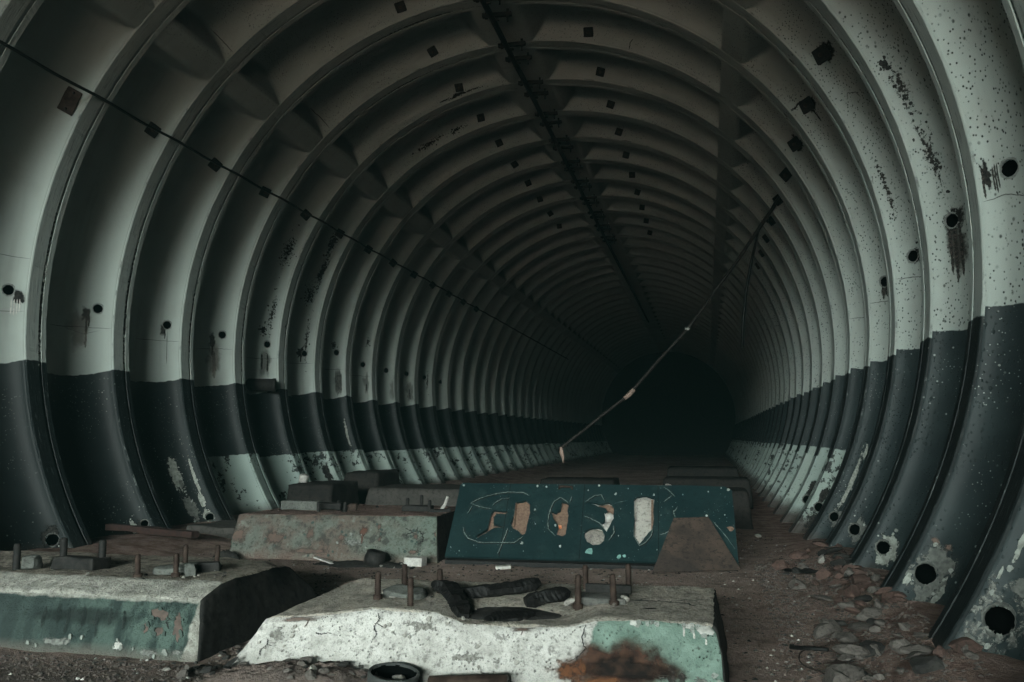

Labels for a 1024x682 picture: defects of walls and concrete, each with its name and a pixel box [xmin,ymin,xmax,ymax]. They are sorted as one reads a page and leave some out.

peeling [165,457,215,522]
spalling [322,464,334,481]
peeling [802,444,868,545]
spalling [874,529,899,567]
spalling [902,538,959,604]
spalling [960,534,1024,655]
peeling [112,607,184,659]
rust [557,640,687,682]